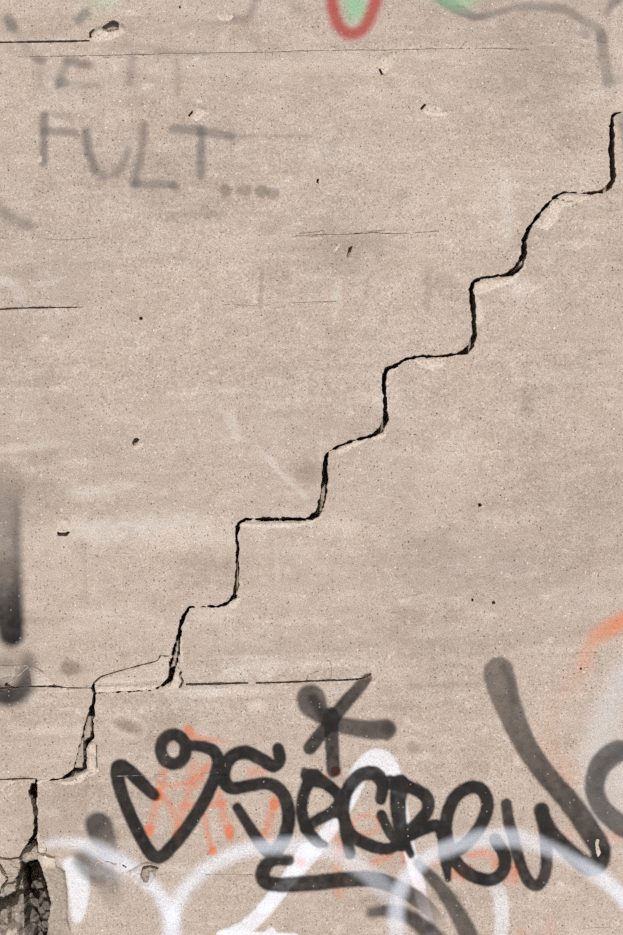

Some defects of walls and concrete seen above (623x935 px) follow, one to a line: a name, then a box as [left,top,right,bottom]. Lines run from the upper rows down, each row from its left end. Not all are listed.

crack [0,40,529,57]
crack [0,112,621,854]
spalling [0,838,71,935]